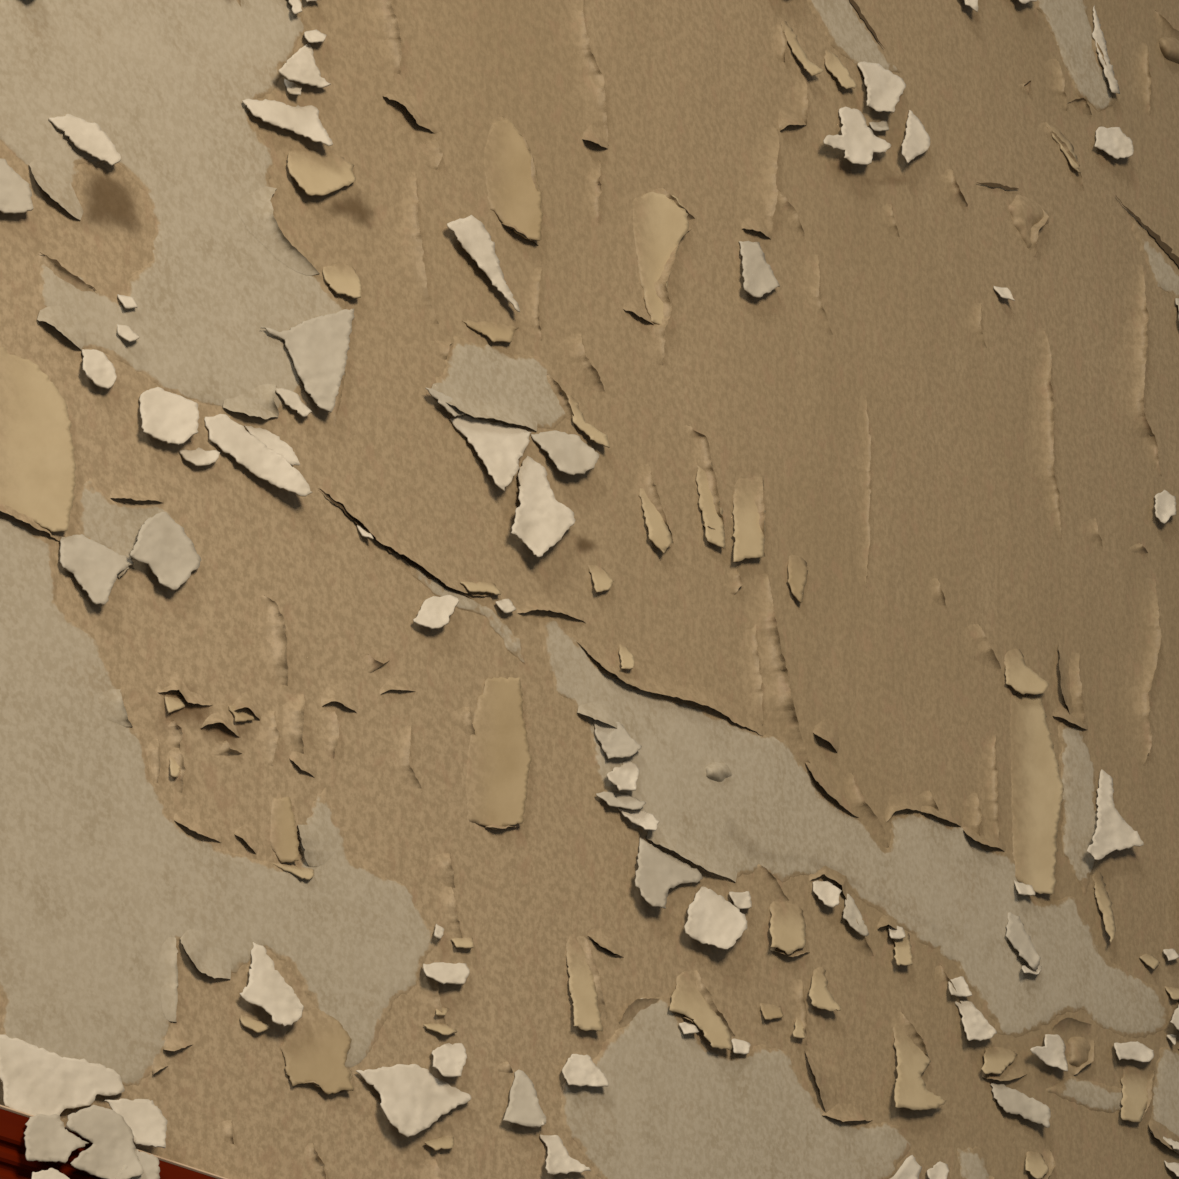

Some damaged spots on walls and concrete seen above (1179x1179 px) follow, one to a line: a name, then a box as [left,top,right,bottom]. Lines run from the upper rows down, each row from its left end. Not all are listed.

peeling [964,0,978,12]
peeling [1019,0,1120,115]
peeling [0,0,361,497]
peeling [378,94,444,324]
peeling [484,116,543,246]
peeling [1094,127,1134,159]
crack [1116,196,1179,267]
peeling [425,215,610,557]
peeling [402,558,525,664]
peeling [0,346,474,1179]
peeling [452,677,532,830]
peeling [496,425,1179,1179]